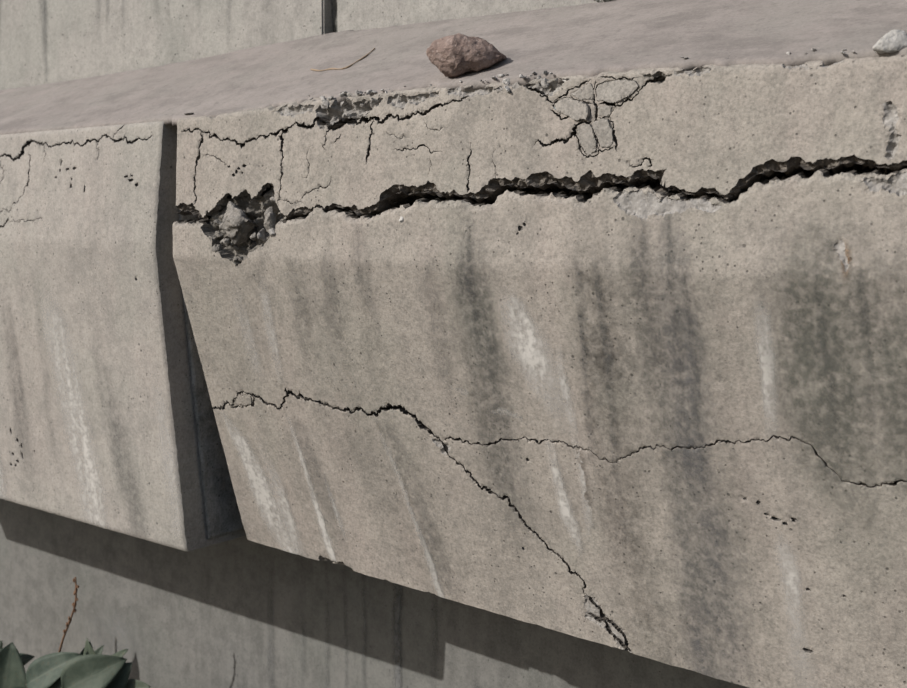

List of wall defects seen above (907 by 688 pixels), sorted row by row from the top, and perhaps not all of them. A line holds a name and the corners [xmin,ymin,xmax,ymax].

crack [0,125,152,228]
spalling [201,186,287,266]
spalling [275,78,571,131]
crack [176,76,907,224]
spalling [643,67,713,84]
water stain [508,298,573,422]
water stain [757,315,775,418]
water stain [226,423,300,554]
water stain [293,433,336,562]
water stain [389,456,444,598]
crack [213,387,907,651]
water stain [552,458,580,547]